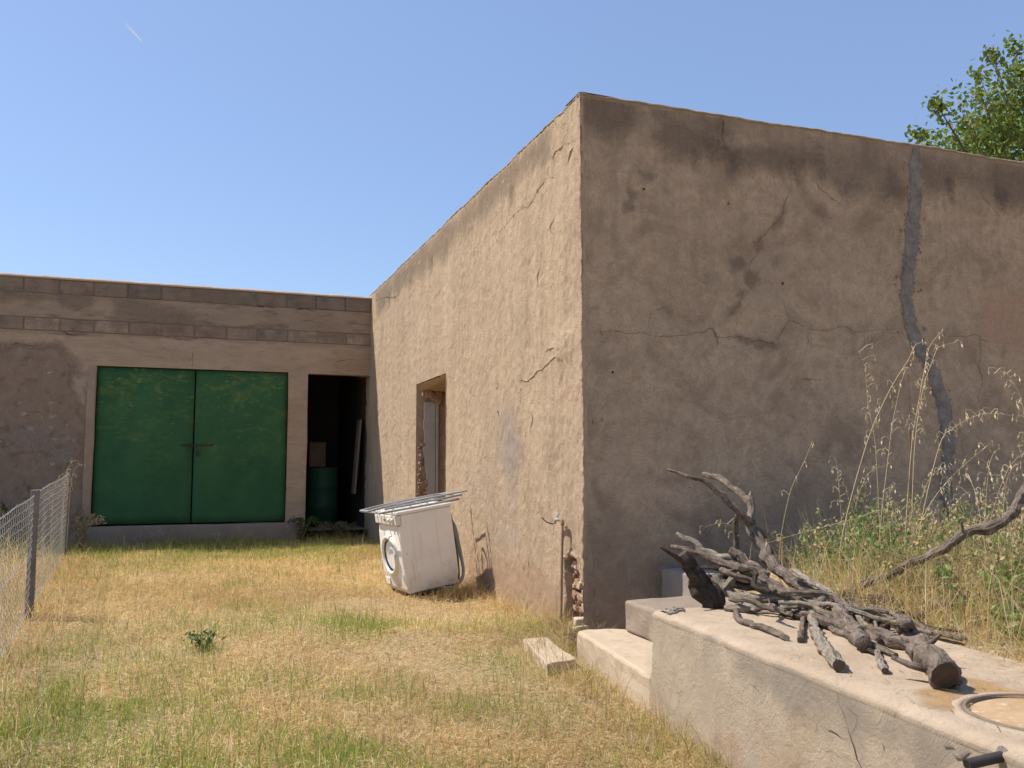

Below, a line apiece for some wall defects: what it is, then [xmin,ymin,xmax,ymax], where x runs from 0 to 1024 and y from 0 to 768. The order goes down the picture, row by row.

crack [499,141,574,232]
crack [520,148,985,524]
spalling [416,443,428,497]
spalling [563,550,596,631]
crack [820,676,861,767]